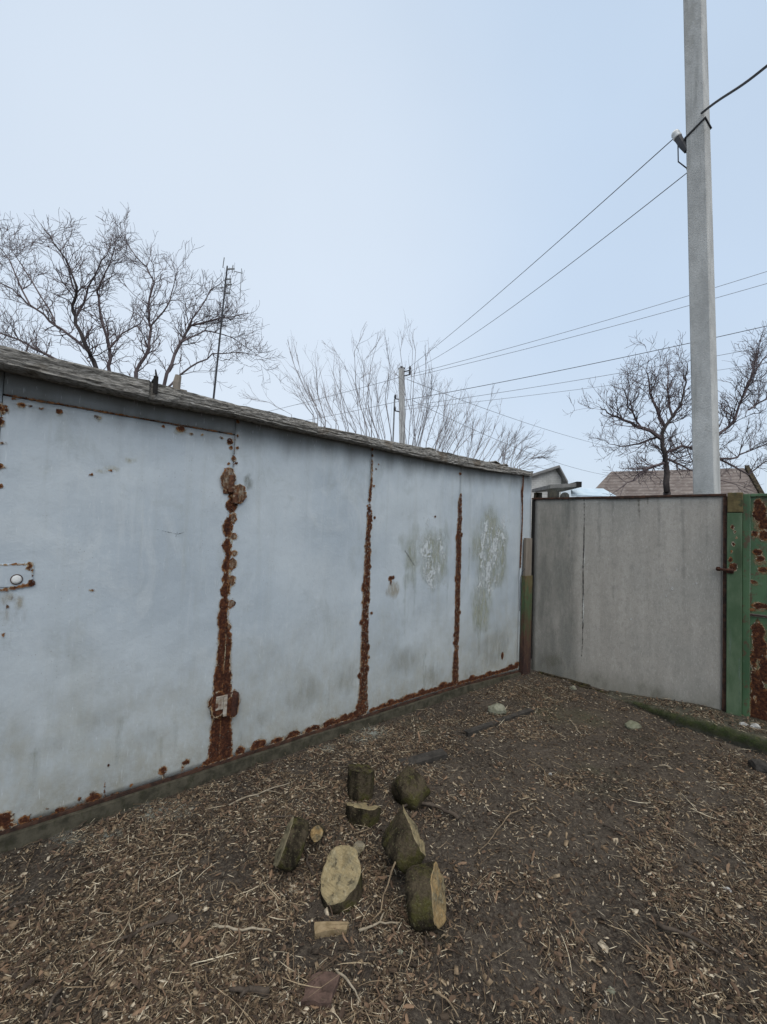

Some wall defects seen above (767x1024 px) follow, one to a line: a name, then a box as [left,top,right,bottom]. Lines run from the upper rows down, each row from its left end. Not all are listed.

corrosion [0,394,519,771]
corrosion [750,498,767,585]
corrosion [750,602,767,721]
corrosion [0,792,118,831]